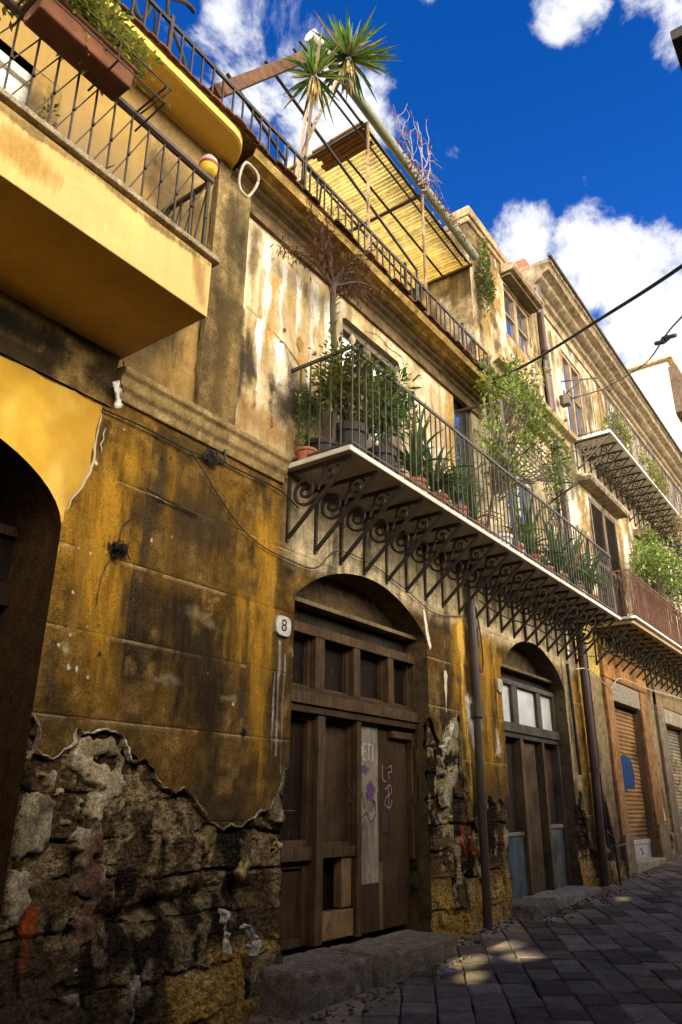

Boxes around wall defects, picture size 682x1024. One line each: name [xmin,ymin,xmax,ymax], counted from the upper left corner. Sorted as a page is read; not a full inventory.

water stain [216,226,331,447]
water stain [78,451,137,668]
water stain [238,513,281,720]
flaking render [0,713,294,1024]
flaking render [424,715,513,936]
flaking render [574,786,600,887]
spalling [603,794,616,861]